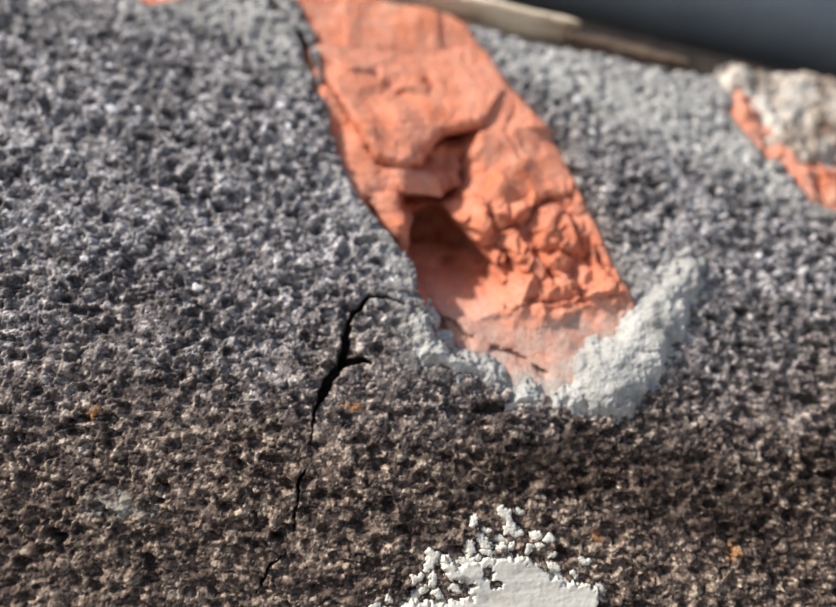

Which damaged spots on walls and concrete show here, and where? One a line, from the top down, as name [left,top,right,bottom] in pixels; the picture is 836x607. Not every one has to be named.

spalling [713,61,836,210]
spalling [298,0,707,425]
crack [311,295,402,426]
crack [293,470,306,528]
crack [260,559,278,587]